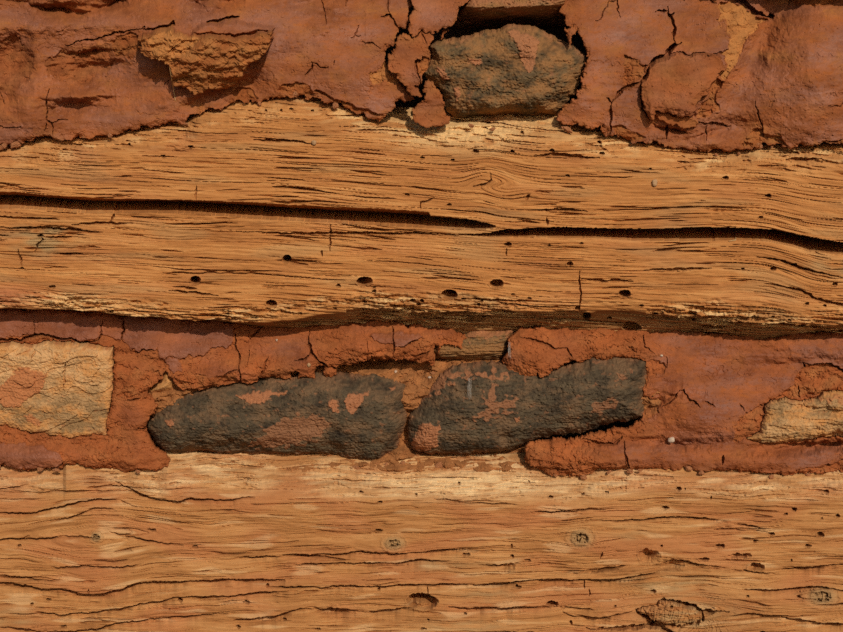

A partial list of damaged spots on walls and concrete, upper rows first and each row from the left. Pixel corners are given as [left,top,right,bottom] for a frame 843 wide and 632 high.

crack [65,20,175,47]
crack [206,15,240,26]
crack [711,0,792,20]
spalling [0,27,275,98]
crack [606,0,727,140]
crack [699,121,732,141]
crack [534,152,600,160]
crack [0,186,843,307]
peeling [0,308,238,390]
crack [294,335,332,368]
crack [521,337,573,358]
spalling [774,363,843,400]